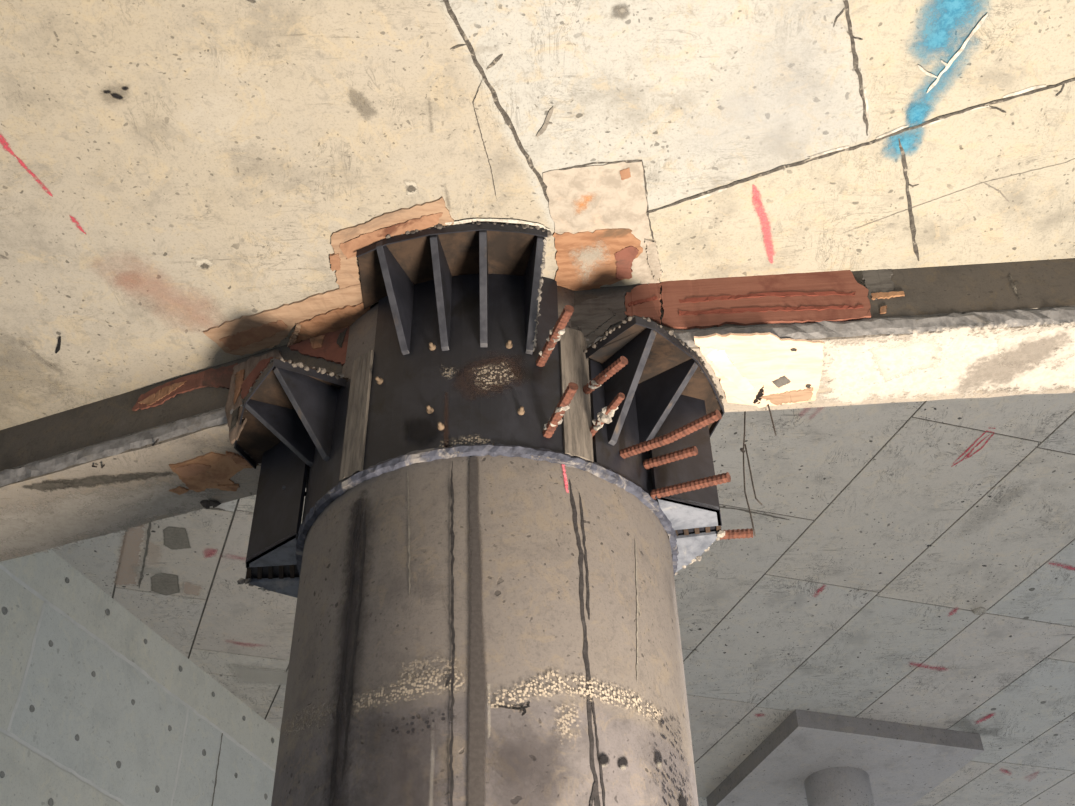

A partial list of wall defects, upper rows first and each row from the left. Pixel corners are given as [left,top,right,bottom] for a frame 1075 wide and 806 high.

crack [443,0,1075,261]
peeling [620,167,631,180]
spalling [195,259,215,269]
peeling [329,212,443,271]
peeling [615,246,639,280]
peeling [219,320,287,351]
peeling [132,363,238,411]
peeling [169,451,259,495]
crack [445,461,455,806]
crack [569,480,605,806]